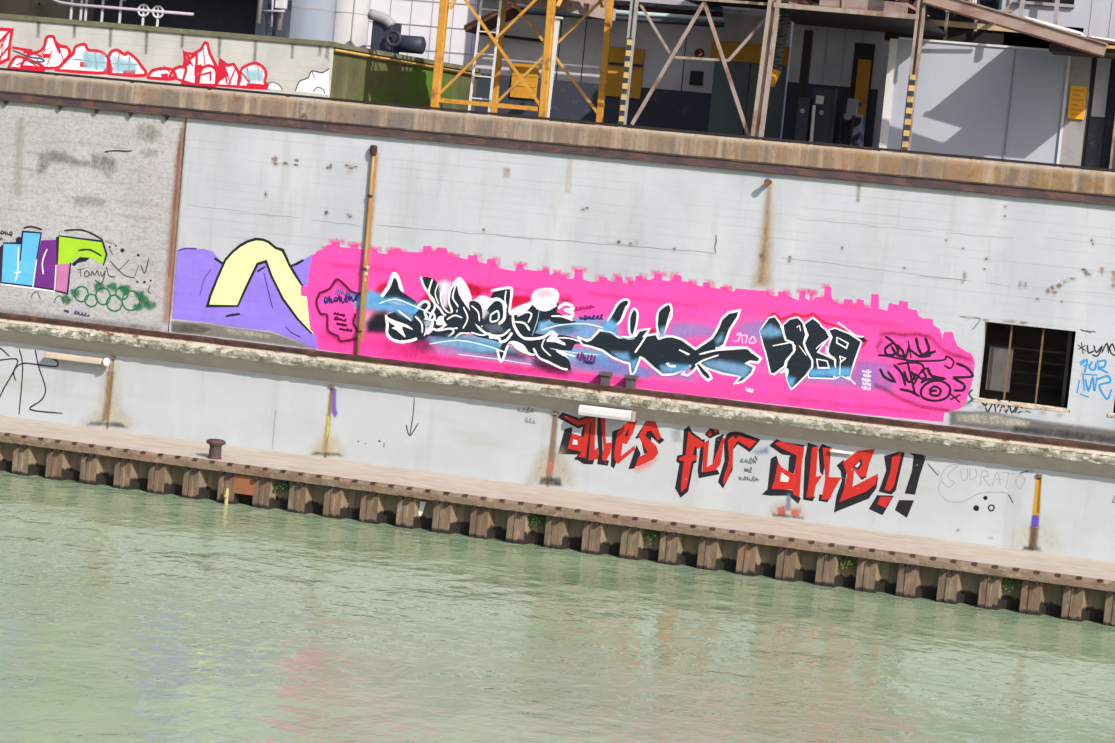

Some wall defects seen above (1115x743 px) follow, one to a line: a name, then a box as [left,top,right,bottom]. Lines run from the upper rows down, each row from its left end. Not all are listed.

corrosion [360,153,377,341]